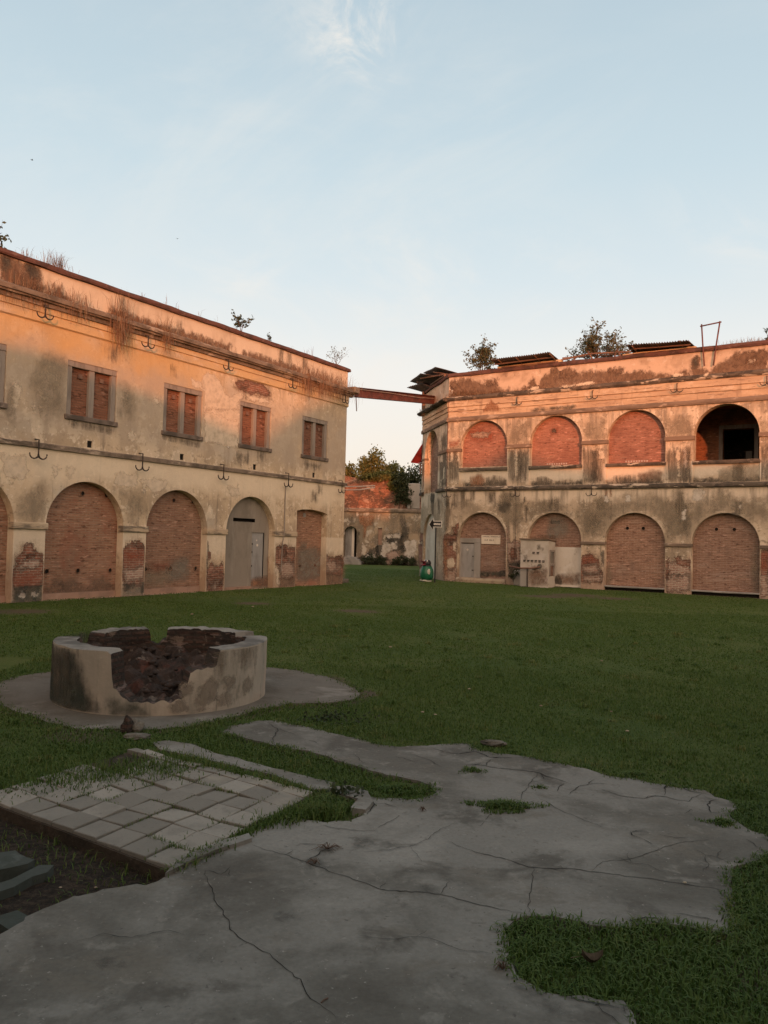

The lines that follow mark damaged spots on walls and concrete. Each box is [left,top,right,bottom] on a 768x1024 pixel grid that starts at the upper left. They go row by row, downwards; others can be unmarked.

peeling [191,372,270,422]
leakage [449,349,768,397]
leakage [430,422,768,537]
spalling [12,542,44,591]
spalling [122,540,145,588]
spalling [275,544,296,585]
spalling [443,523,459,581]
spalling [581,551,604,584]
spalling [665,556,691,593]
peeling [171,676,253,712]
crack [254,749,736,924]
crack [204,868,336,1017]